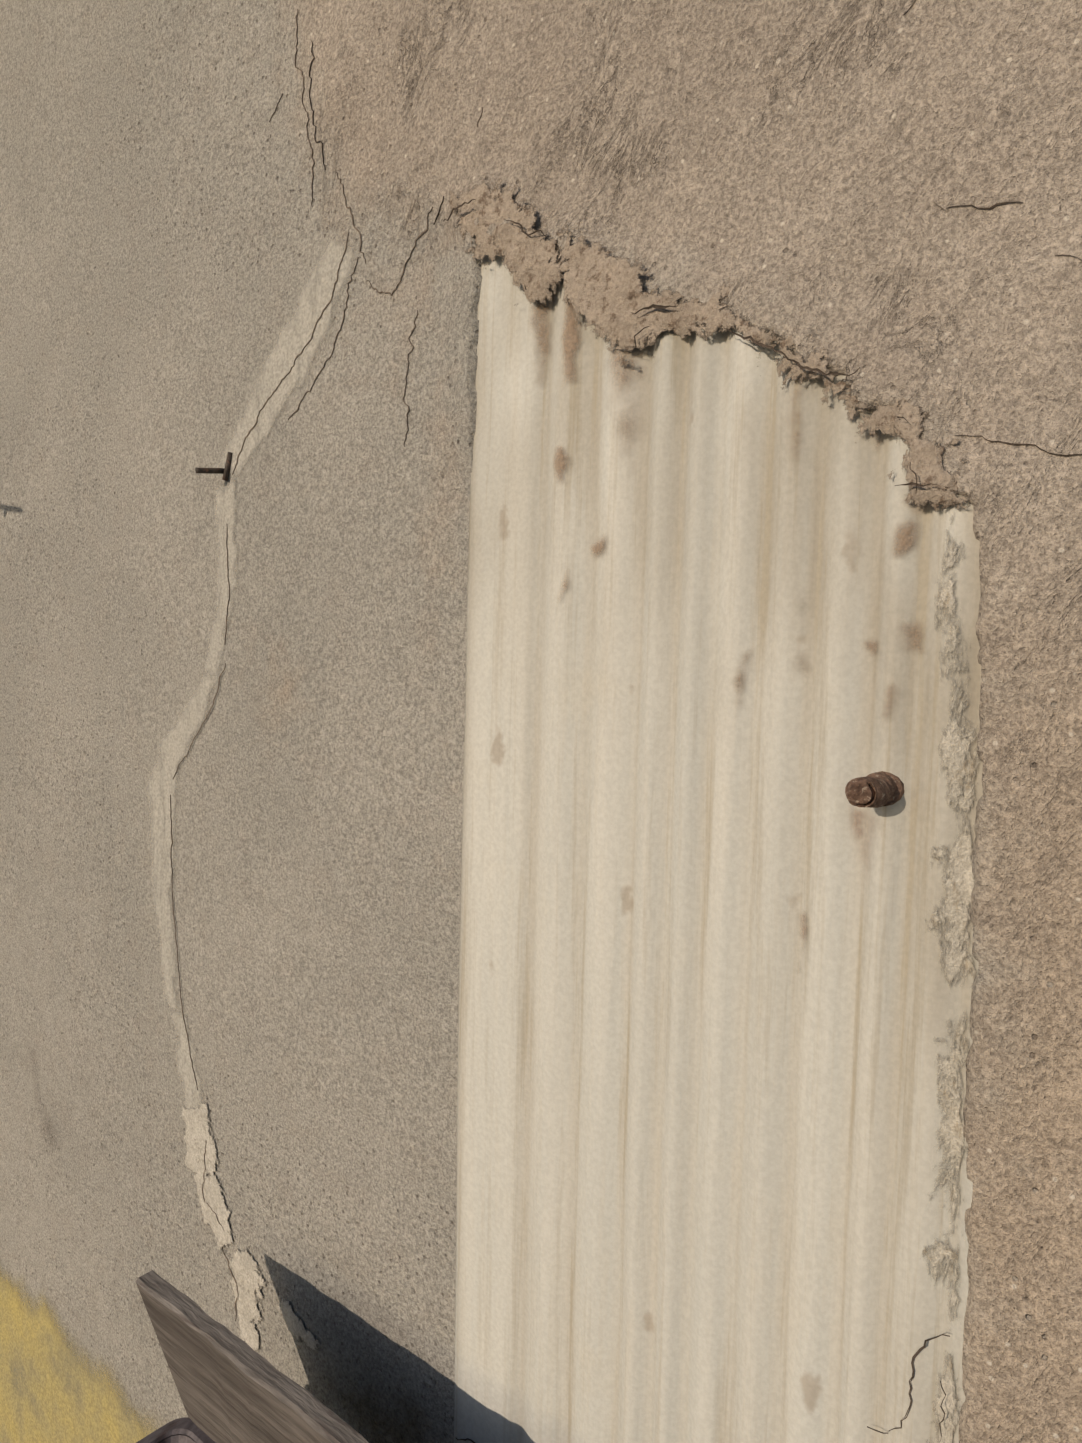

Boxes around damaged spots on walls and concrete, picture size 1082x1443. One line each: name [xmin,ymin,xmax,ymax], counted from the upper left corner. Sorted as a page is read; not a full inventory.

crack [935,202,1023,211]
crack [954,435,1082,456]
flaking render [443,177,980,987]
crack [149,9,444,1351]
flaking render [922,1012,969,1321]
crack [867,1334,950,1441]
flaking render [933,1354,960,1443]